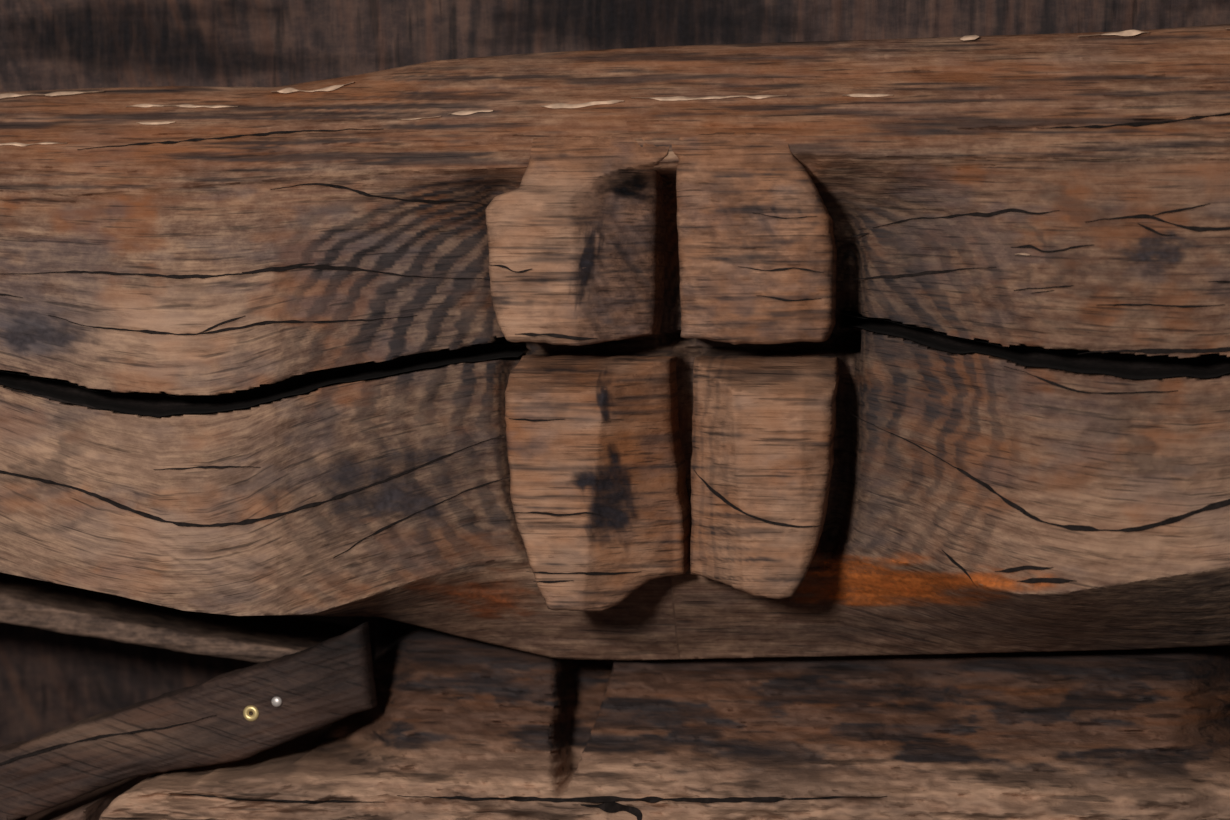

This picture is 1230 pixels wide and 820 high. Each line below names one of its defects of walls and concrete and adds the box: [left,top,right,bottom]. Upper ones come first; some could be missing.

crack [77,128,384,150]
crack [851,208,1059,237]
crack [1017,203,1230,252]
crack [0,263,531,298]
crack [48,315,417,335]
crack [738,266,1230,394]
crack [0,333,597,417]
crack [0,418,565,527]
crack [845,410,1230,532]
crack [694,470,820,528]
crack [527,571,641,583]
crack [942,550,1075,588]